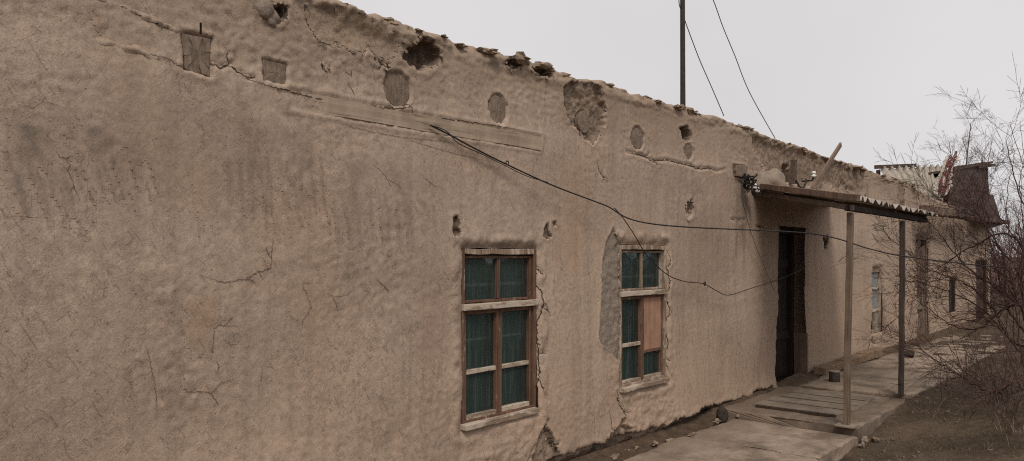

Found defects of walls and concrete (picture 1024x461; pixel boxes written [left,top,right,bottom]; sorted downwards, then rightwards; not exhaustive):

crack [210,53,322,100]
crack [321,62,538,162]
spalling [505,58,607,145]
crack [628,152,718,174]
crack [187,316,241,403]
crack [204,240,273,283]
peeling [453,215,461,236]
crack [535,265,550,394]
peeling [599,229,620,361]
crack [665,251,673,376]
spalling [532,425,563,461]